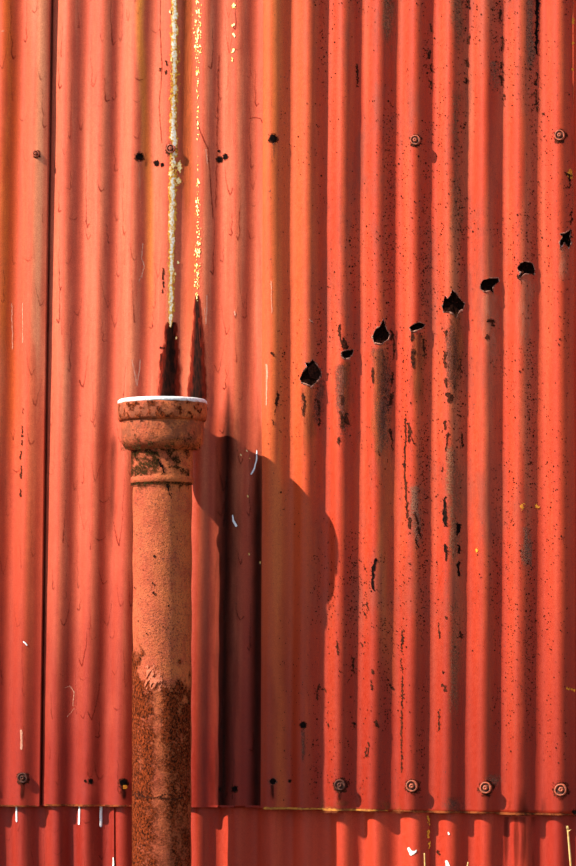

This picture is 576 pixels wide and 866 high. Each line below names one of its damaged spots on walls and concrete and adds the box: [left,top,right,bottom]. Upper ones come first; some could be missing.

peeling [382,0,394,40]
peeling [452,0,470,47]
corrosion [263,658,576,815]